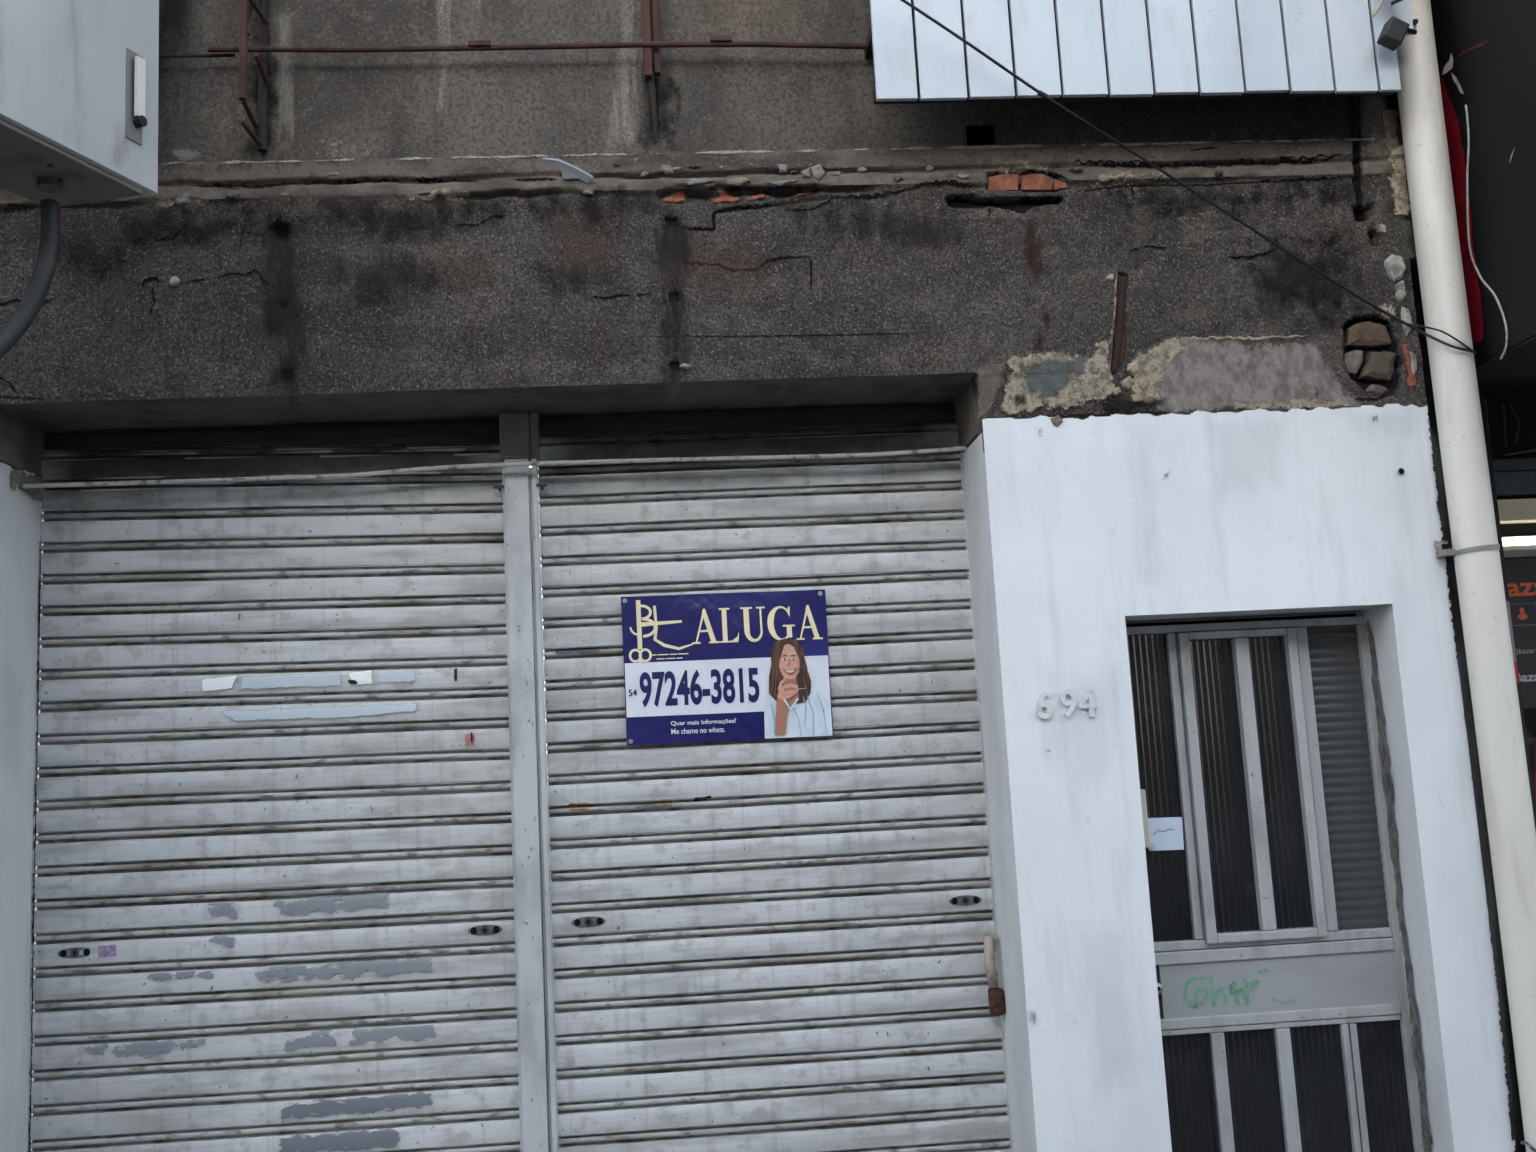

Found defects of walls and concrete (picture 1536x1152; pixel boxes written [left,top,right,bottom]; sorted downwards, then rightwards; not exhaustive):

spalling [152,193,201,208]
leakage [331,193,502,237]
spalling [407,171,471,201]
leakage [528,186,649,222]
crack [665,180,983,289]
flaking render [614,158,1168,256]
peeling [977,96,1420,427]
leakage [61,204,306,380]
crack [591,292,651,300]
crack [633,331,926,339]